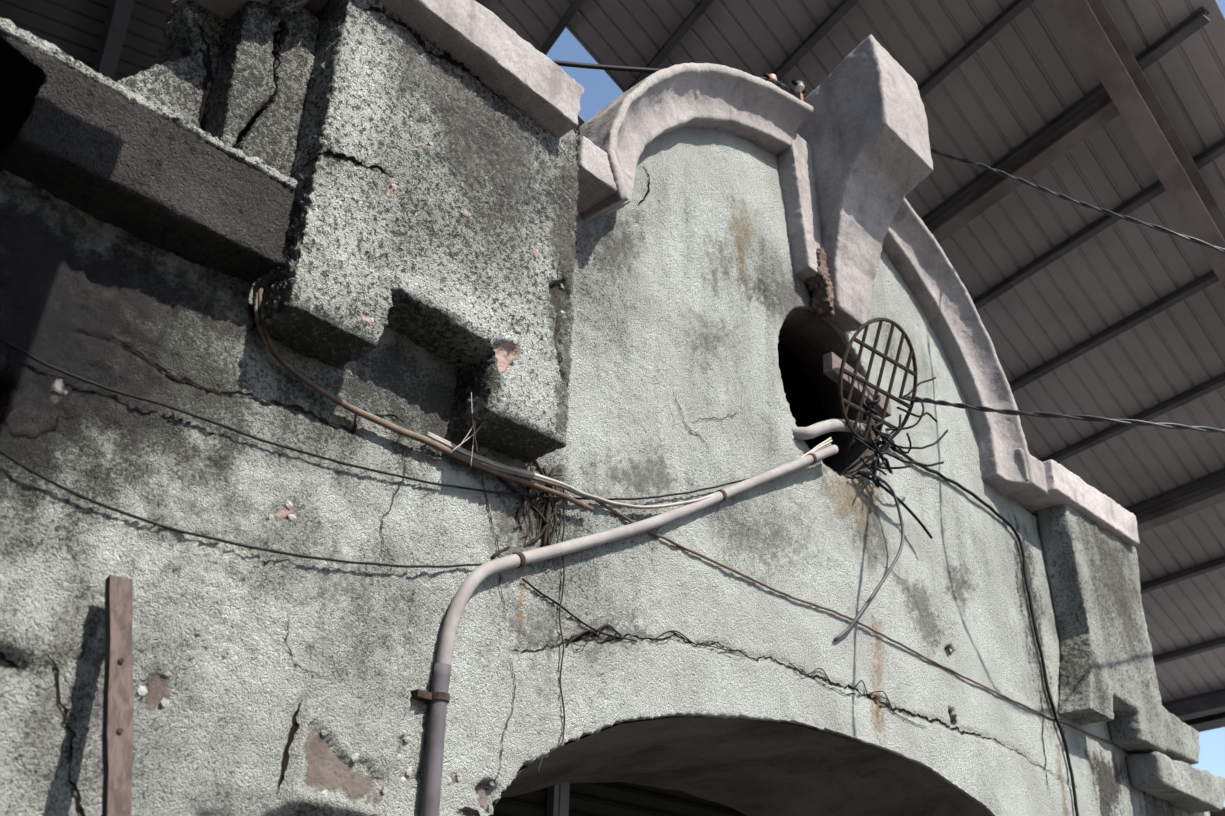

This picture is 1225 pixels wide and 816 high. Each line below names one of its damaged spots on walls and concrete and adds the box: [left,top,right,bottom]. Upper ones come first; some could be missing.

crack [233,19,289,151]
crack [291,151,400,180]
spalling [493,338,519,374]
crack [64,328,406,559]
water stain [897,581,944,646]
water stain [946,564,976,604]
crack [0,652,19,668]
crack [44,652,102,816]
spalling [305,730,424,803]
spalling [475,780,494,815]
crack [457,626,1078,816]
water stain [1084,749,1128,816]